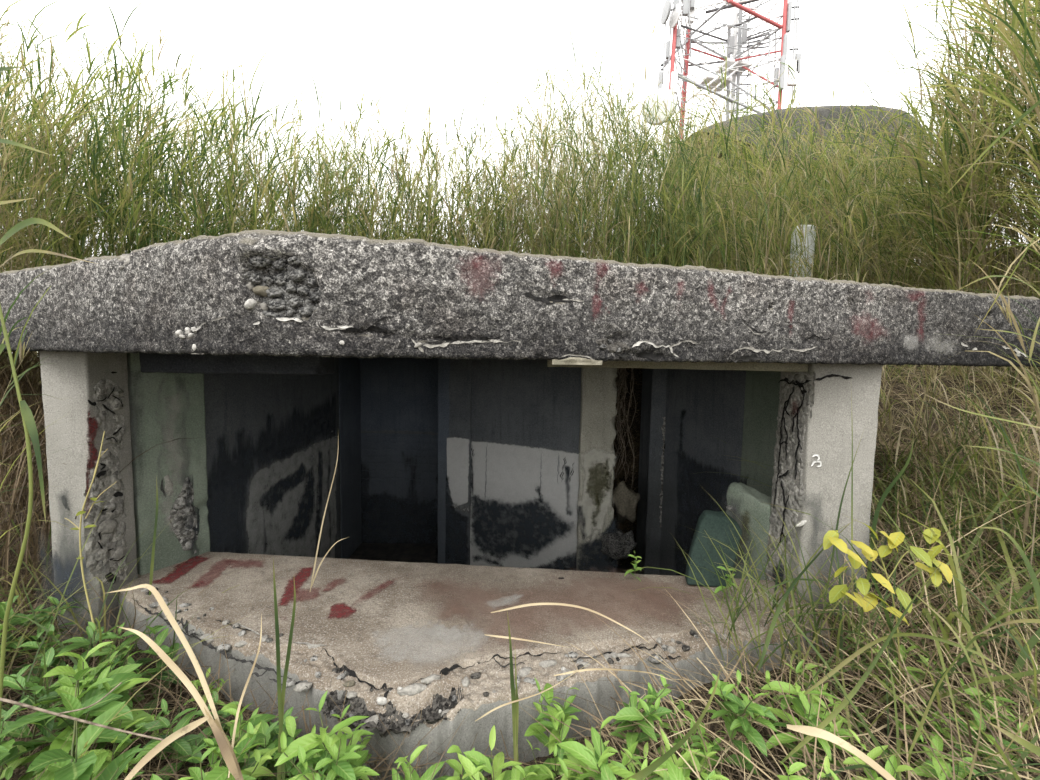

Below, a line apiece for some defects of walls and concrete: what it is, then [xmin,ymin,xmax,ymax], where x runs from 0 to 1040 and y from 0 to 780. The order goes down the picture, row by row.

spalling [244,254,322,325]
crack [525,293,583,304]
crack [730,319,830,363]
spalling [83,379,129,585]
spalling [168,476,198,554]
crack [773,374,852,546]
crack [133,587,731,719]